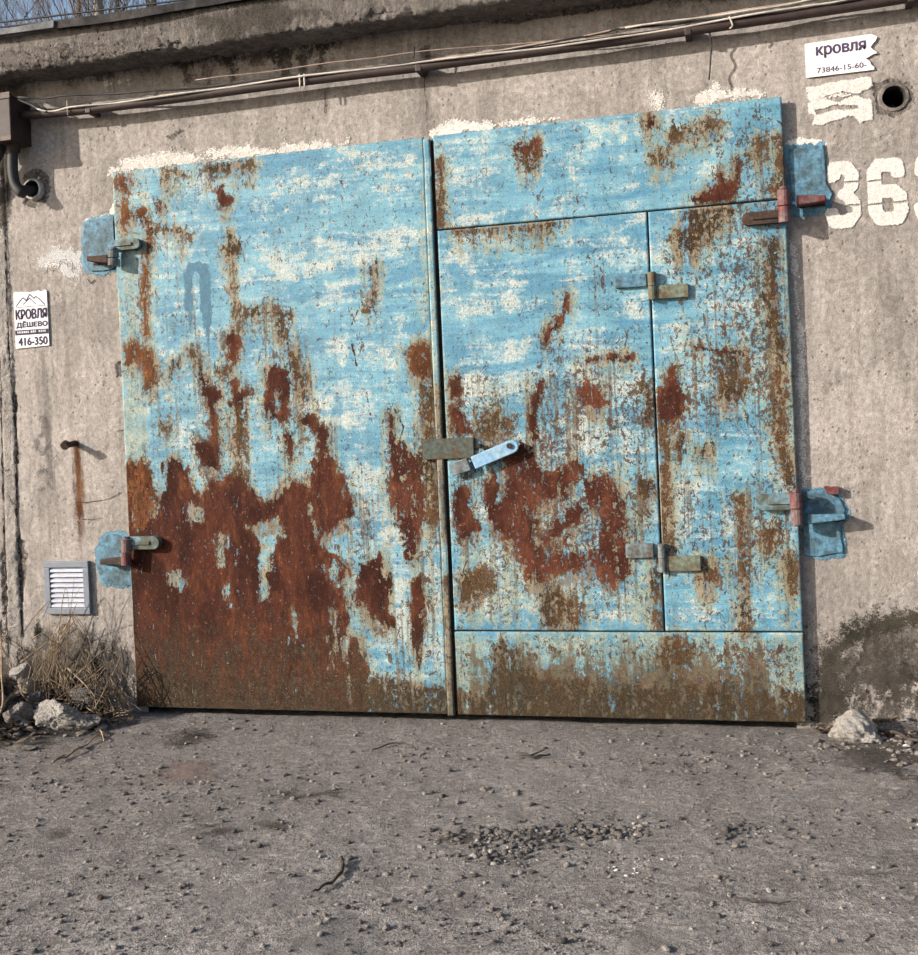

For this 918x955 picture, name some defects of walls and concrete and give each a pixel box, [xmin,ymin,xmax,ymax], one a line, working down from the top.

corrosion [435,157,566,241]
corrosion [513,136,543,172]
corrosion [662,128,783,260]
crack [0,152,24,658]
corrosion [74,441,84,536]
corrosion [113,158,446,713]
corrosion [537,291,570,345]
corrosion [581,351,636,366]
corrosion [447,362,805,721]
corrosion [693,344,753,406]
corrosion [755,235,795,492]
water stain [805,603,918,727]